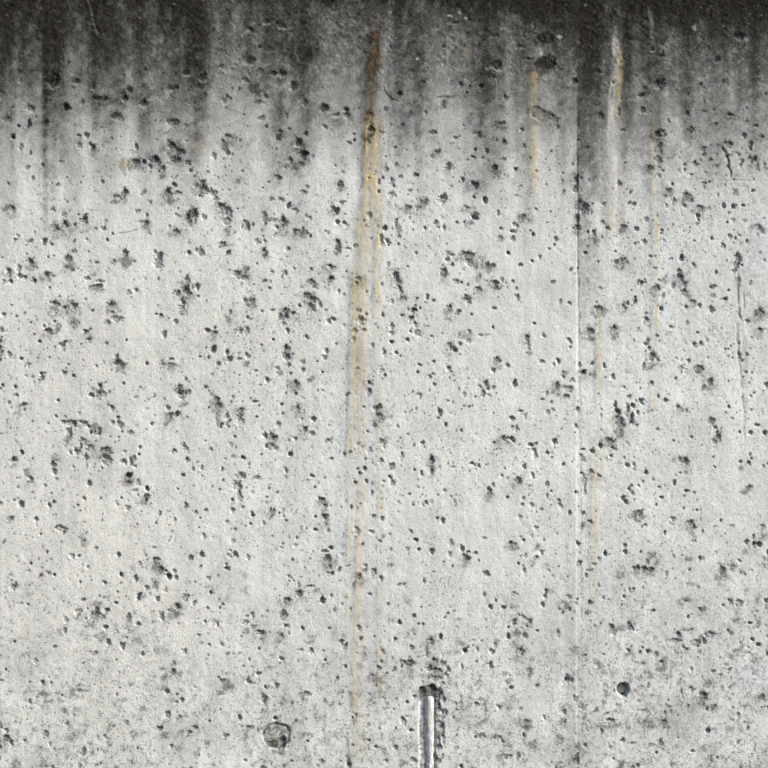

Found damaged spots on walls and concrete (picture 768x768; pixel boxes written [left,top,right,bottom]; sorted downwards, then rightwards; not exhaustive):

rust [365,28,381,196]
damp [0,0,768,135]